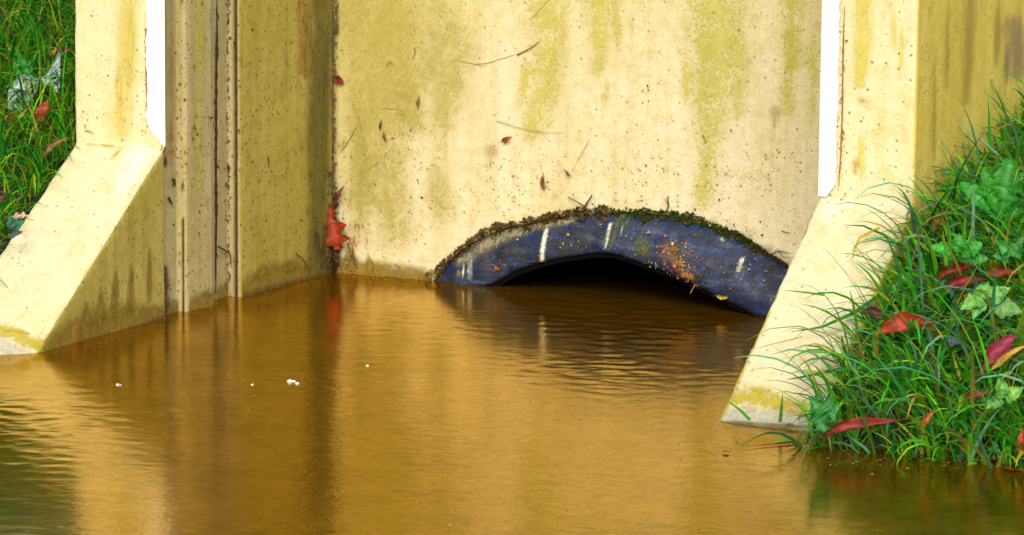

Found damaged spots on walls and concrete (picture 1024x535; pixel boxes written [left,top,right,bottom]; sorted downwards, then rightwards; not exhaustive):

water stain [681,10,712,144]
water stain [81,266,135,339]